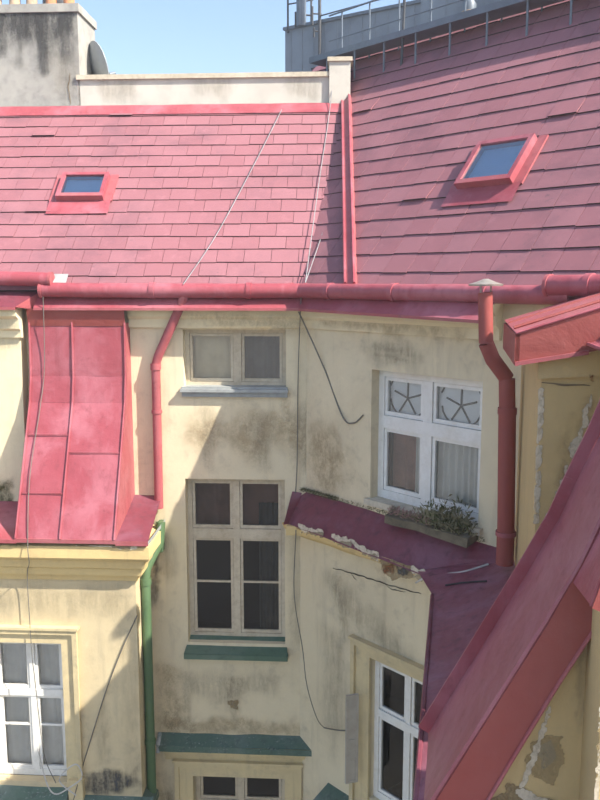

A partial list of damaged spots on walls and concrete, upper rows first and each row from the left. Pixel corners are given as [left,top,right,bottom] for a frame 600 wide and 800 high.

damp [19,13,48,73]
damp [58,12,72,56]
spalling [298,523,425,581]
crack [333,568,421,594]
flaking render [525,735,565,785]
damp [86,771,133,794]
flaking render [491,783,552,800]